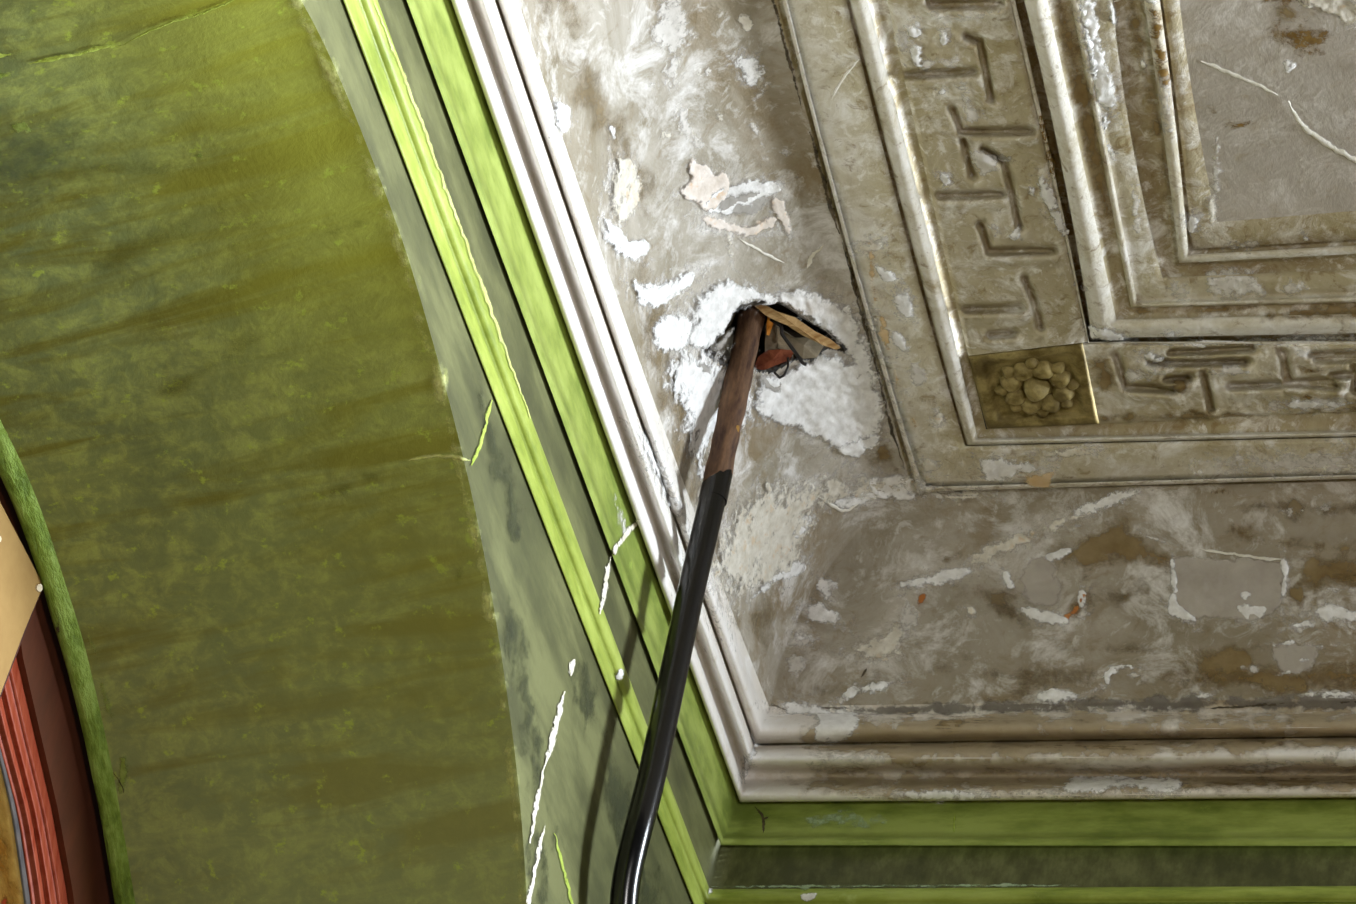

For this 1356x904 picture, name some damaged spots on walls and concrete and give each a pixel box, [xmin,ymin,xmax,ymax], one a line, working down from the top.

crack [0,0,234,64]
water stain [577,68,628,157]
crack [1201,61,1356,163]
peeling [598,124,706,353]
spalling [673,158,793,257]
water stain [646,307,662,332]
water stain [659,385,690,429]
peeling [639,425,687,532]
water stain [1065,521,1168,567]
peeling [1168,559,1196,621]
peeling [1237,591,1266,619]
water stain [802,544,1356,800]